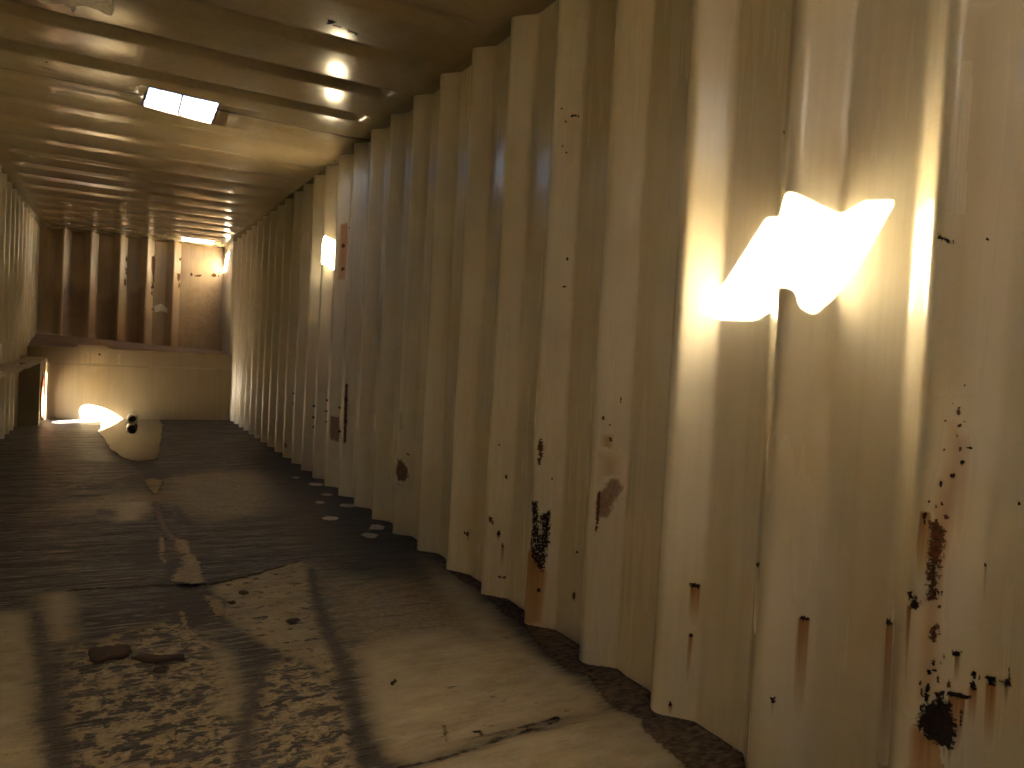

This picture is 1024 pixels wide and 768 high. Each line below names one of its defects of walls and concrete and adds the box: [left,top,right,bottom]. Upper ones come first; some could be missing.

rust [592,416,628,532]
rust [521,501,552,627]
rust [682,583,702,694]
rust [760,420,843,733]
rust [875,403,1011,768]